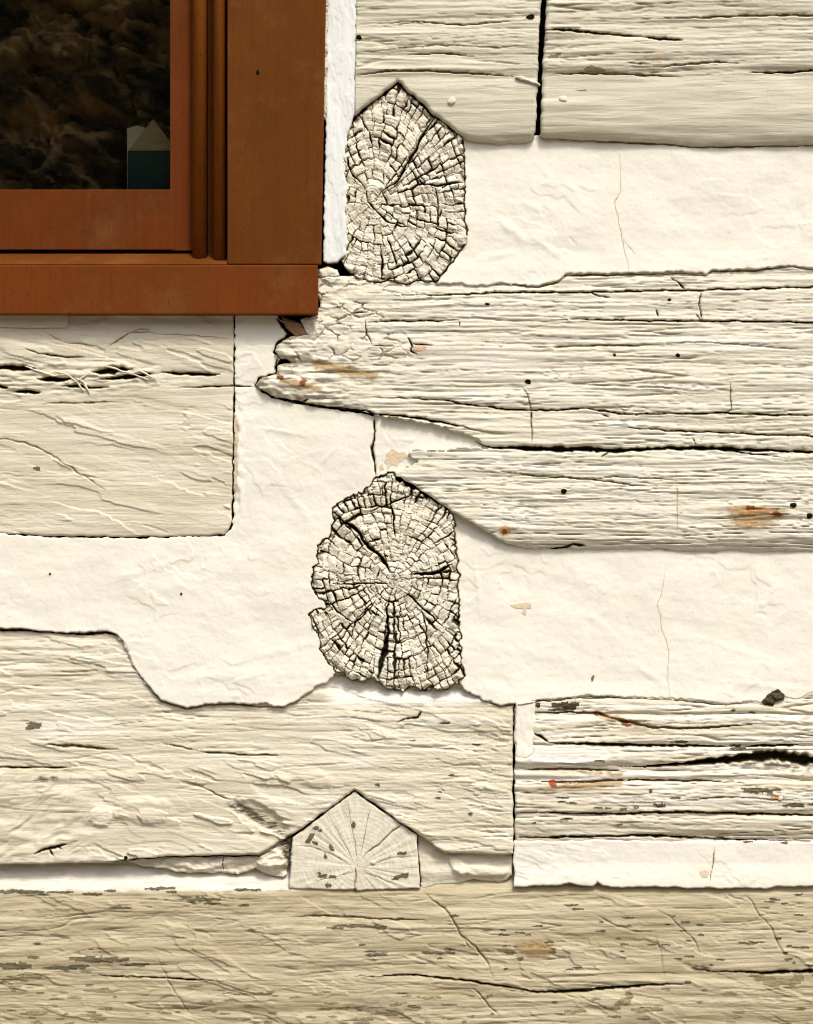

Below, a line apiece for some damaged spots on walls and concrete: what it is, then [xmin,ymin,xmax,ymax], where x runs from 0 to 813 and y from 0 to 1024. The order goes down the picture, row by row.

crack [347,117,813,354]
crack [0,318,813,676]
rust [727,506,784,527]
crack [465,574,813,881]
crack [297,893,813,1017]